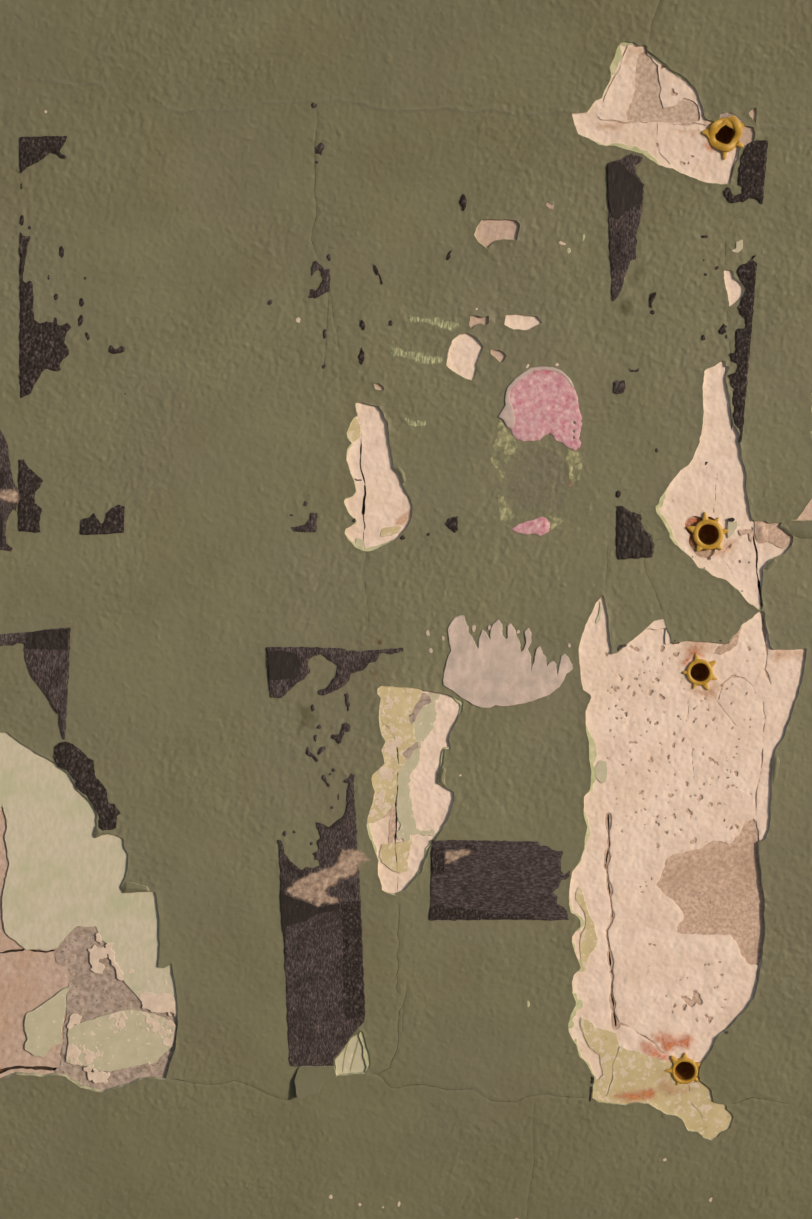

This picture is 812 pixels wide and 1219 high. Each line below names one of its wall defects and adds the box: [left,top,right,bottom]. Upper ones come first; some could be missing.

peeling [572,42,756,184]
peeling [345,403,413,551]
peeling [797,499,812,521]
peeling [367,686,464,894]
peeling [568,361,806,1139]
peeling [0,732,178,1090]
peeling [336,1031,370,1074]